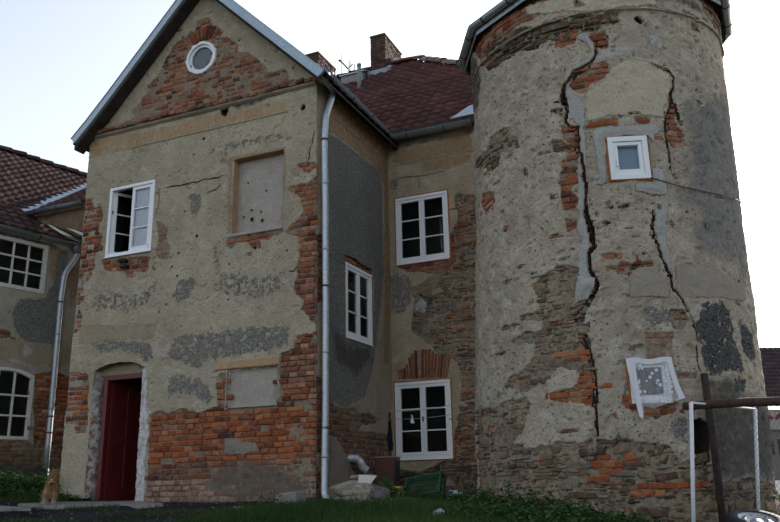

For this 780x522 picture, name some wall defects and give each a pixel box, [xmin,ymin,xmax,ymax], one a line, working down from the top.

crack [155,175,223,216]
flaking render [125,18,295,124]
flaking render [474,0,619,94]
flaking render [531,107,618,239]
crack [553,41,607,307]
crack [654,65,683,171]
flaking render [0,371,94,481]
flaking render [74,199,180,333]
flaking render [139,162,394,503]
flaking render [399,181,780,522]
crack [583,334,601,441]
crack [650,210,701,371]